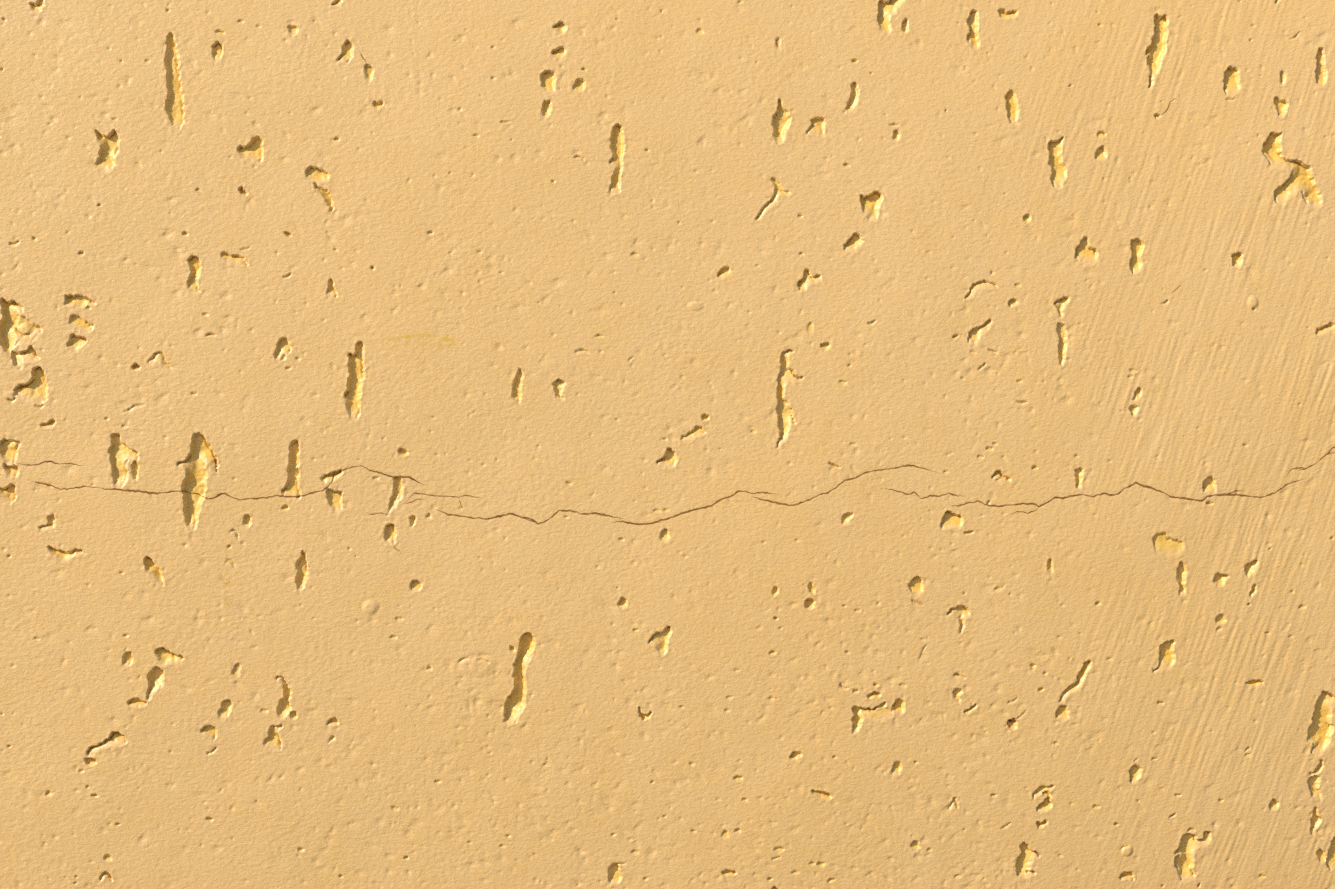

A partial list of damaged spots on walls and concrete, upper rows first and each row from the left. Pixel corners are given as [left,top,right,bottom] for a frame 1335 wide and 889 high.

spalling [163,31,186,135]
spalling [1144,11,1171,91]
spalling [606,122,627,199]
hole [1259,69,1325,212]
spalling [0,295,57,431]
spalling [340,339,367,422]
hole [772,348,806,452]
hole [173,431,220,533]
crack [16,444,1335,525]
hole [502,630,537,729]
spalling [1305,689,1335,873]